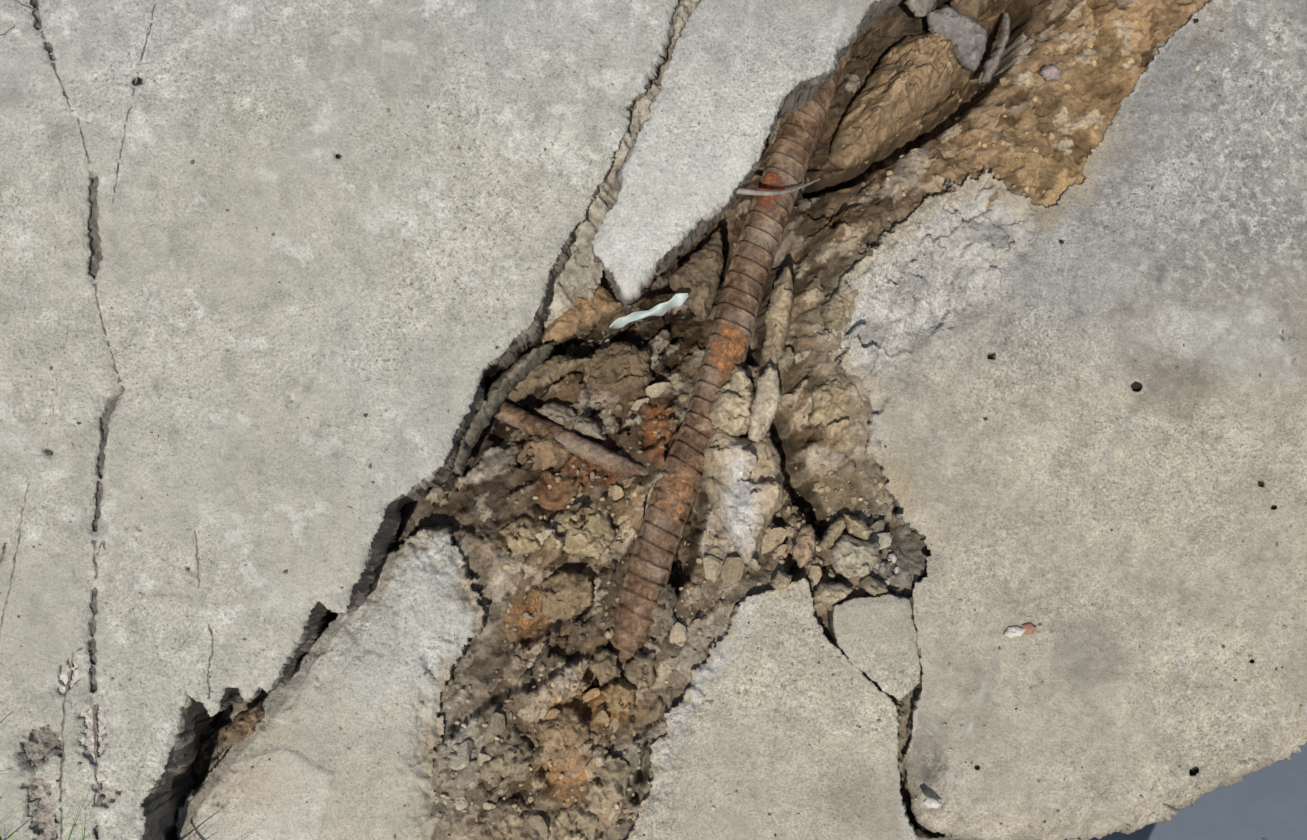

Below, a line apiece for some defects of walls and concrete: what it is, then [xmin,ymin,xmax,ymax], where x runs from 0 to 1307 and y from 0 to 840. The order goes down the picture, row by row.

crack [540,0,699,328]
corrosion [757,172,785,208]
corrosion [708,323,748,375]
crack [0,0,156,840]
corrosion [564,455,617,488]
corrosion [647,408,694,520]
spalling [393,0,1209,840]
crack [193,531,201,589]
crack [206,624,214,698]
spalling [191,689,271,789]
corrosion [588,682,620,718]
crack [827,597,923,706]